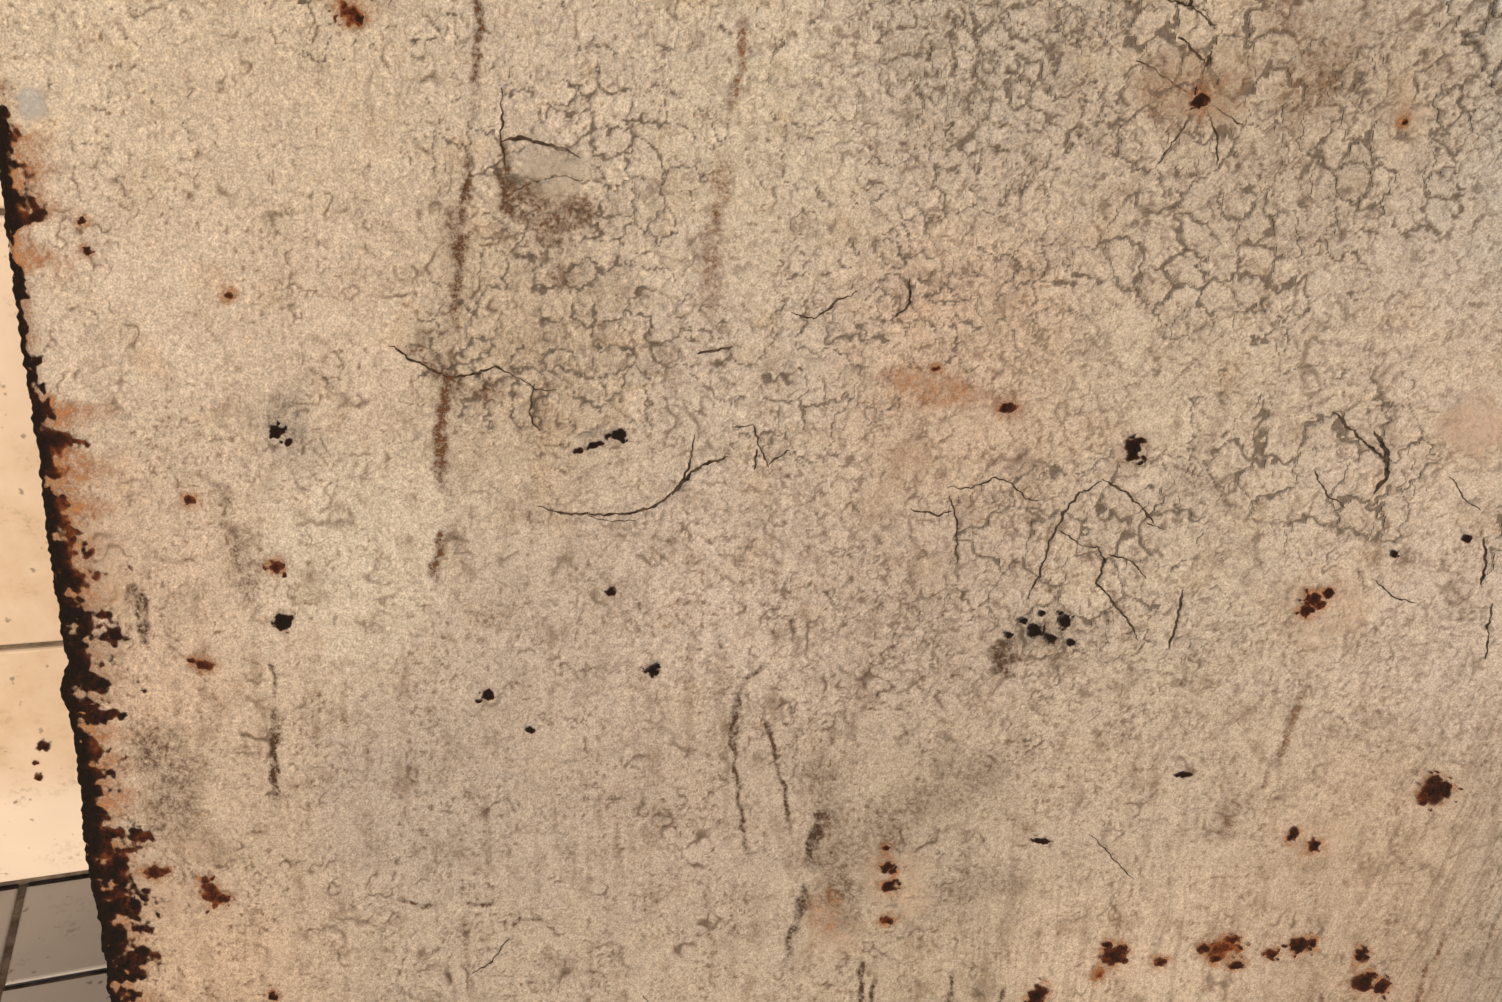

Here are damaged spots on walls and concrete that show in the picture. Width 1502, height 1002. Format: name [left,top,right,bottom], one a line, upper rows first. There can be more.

crack [499,88,583,192]
peeling [725,0,1502,437]
crack [388,345,556,431]
crack [538,425,790,522]
crack [1315,412,1390,508]
rust [0,85,171,1002]
crack [910,476,1184,649]
rust [1296,586,1359,628]
rust [1415,771,1463,812]
rust [1092,939,1131,982]
rust [1197,933,1318,971]
rust [1347,945,1392,1000]